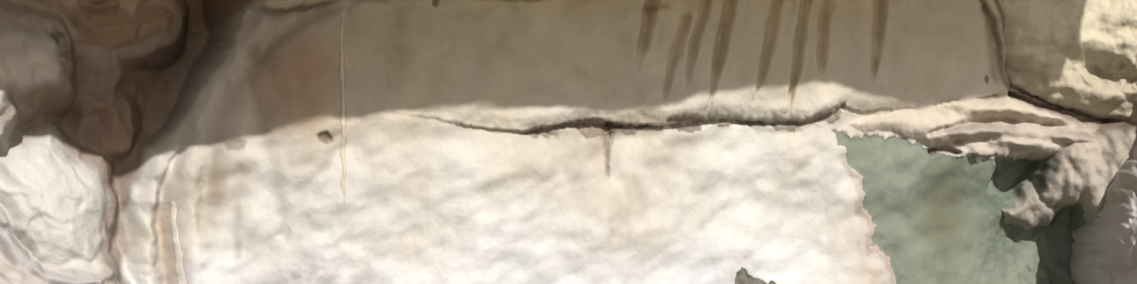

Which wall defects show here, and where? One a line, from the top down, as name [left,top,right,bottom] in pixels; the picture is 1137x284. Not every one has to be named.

crack [531,107,841,138]
peeling [833,129,1086,284]
spalling [735,268,775,284]